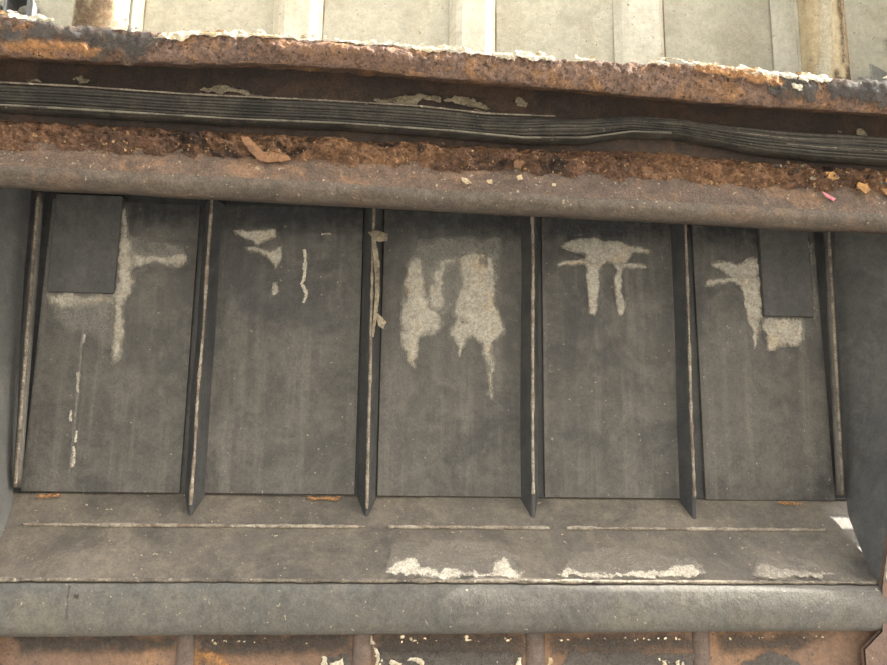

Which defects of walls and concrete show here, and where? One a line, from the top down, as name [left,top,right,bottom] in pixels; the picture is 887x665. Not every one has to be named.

rust [0,0,887,117]
rust [0,119,887,195]
leakage [50,209,187,360]
leakage [236,229,282,267]
leakage [300,249,308,303]
leakage [401,237,504,386]
leakage [558,237,649,315]
leakage [706,259,803,350]
leakage [69,372,80,470]
leakage [386,542,522,580]
leakage [558,549,702,579]
peeling [371,636,425,665]